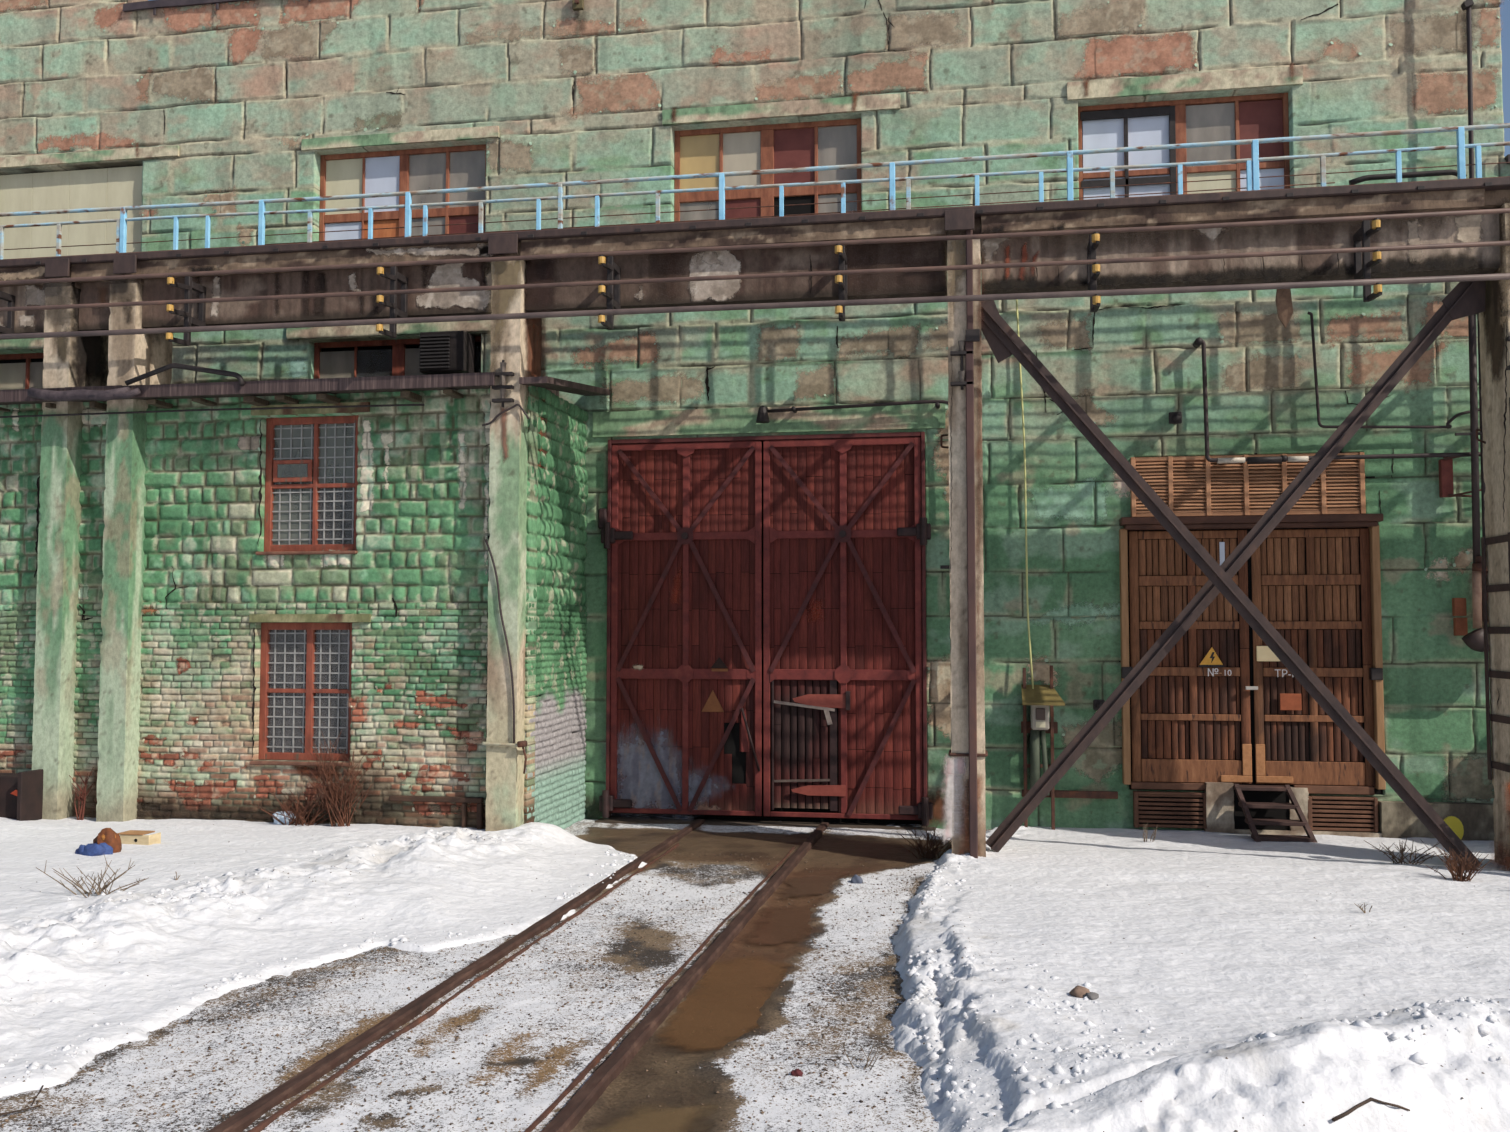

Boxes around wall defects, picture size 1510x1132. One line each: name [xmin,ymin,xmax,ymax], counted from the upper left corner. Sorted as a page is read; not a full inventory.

crack [864,0,895,51]
spalling [366,243,493,310]
spalling [688,250,742,302]
flaking render [393,691,485,752]
flaking render [139,734,285,811]
flaking render [361,749,484,816]